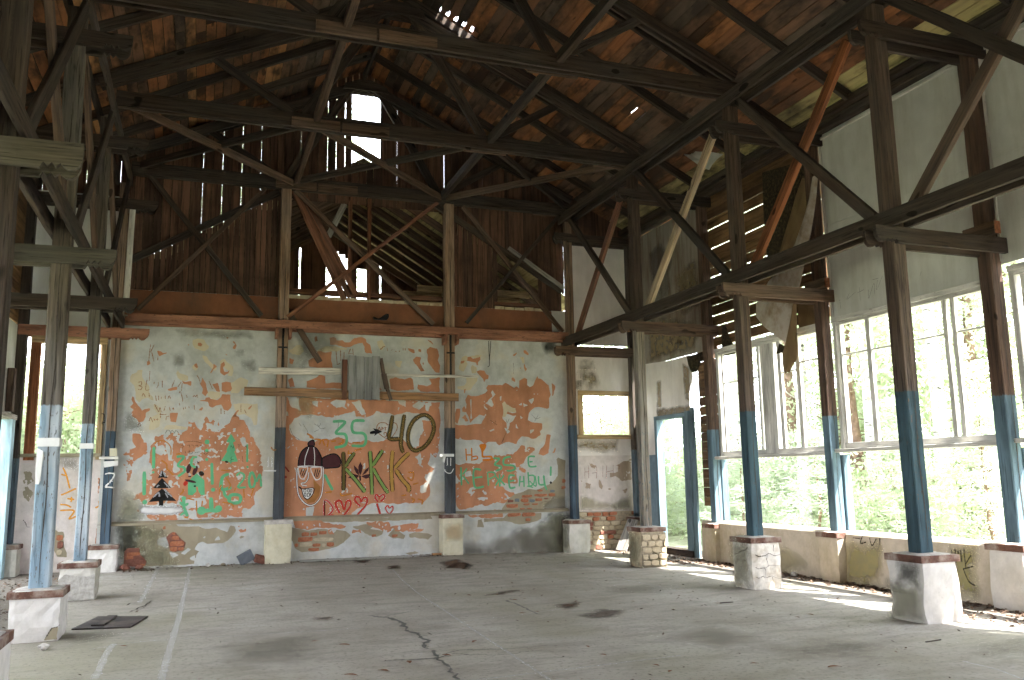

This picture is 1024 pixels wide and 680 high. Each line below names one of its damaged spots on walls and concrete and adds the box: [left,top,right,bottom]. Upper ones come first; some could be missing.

peeling [123,337,263,567]
peeling [284,336,441,552]
peeling [455,350,566,527]
flaking render [579,511,634,551]
crack [369,611,556,679]